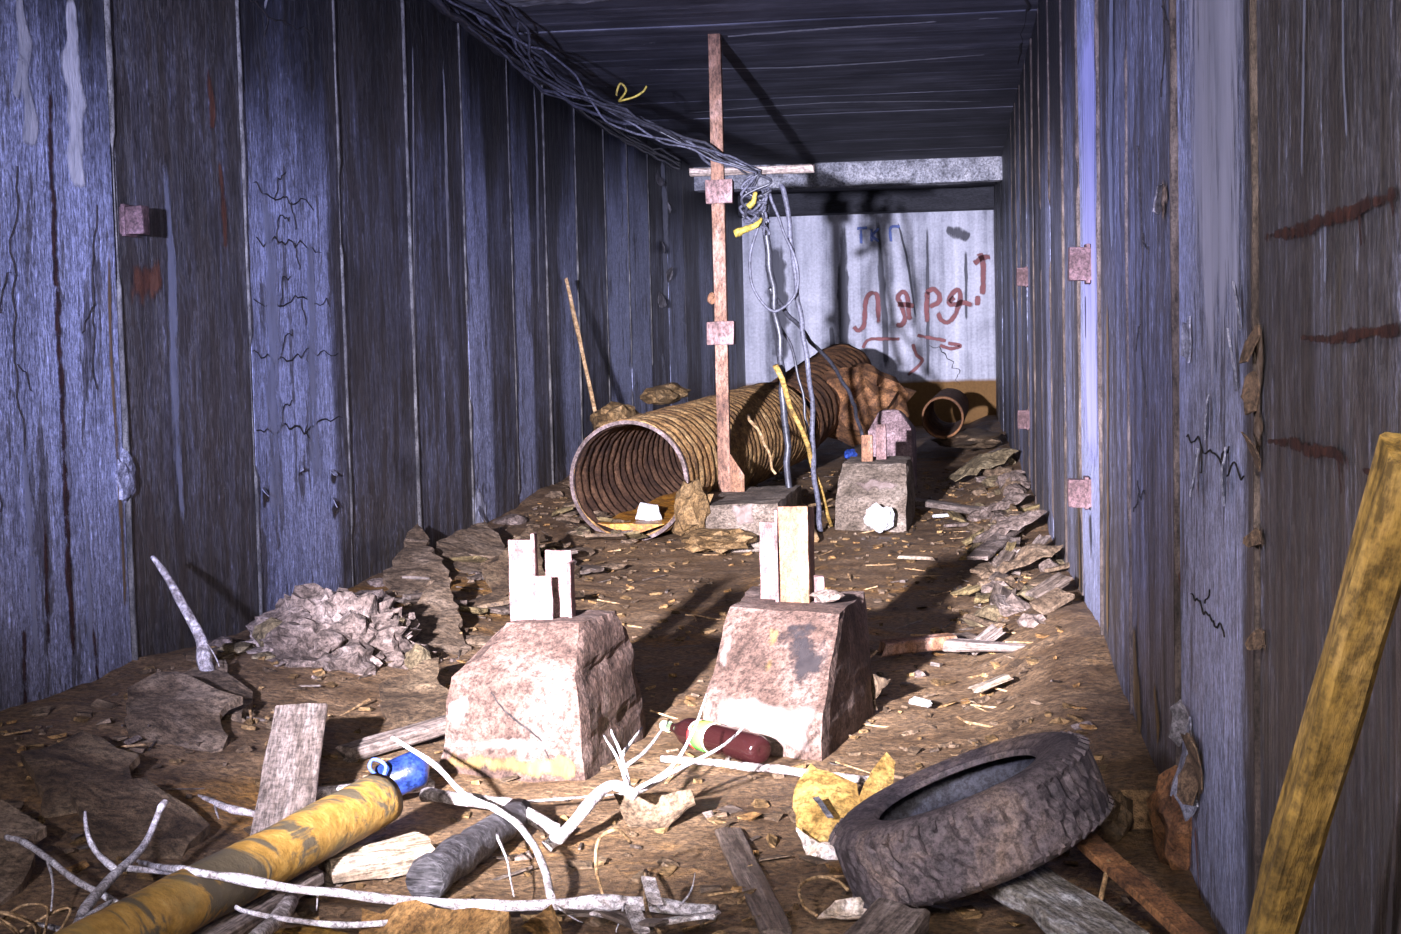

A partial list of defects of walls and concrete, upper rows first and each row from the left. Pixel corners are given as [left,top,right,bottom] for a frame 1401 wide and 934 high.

water stain [12,0,38,146]
water stain [61,0,86,187]
corrosion [1266,187,1396,246]
crack [253,171,338,365]
corrosion [1300,323,1400,344]
crack [250,400,341,438]
crack [1186,434,1245,481]
corrosion [1268,437,1370,494]